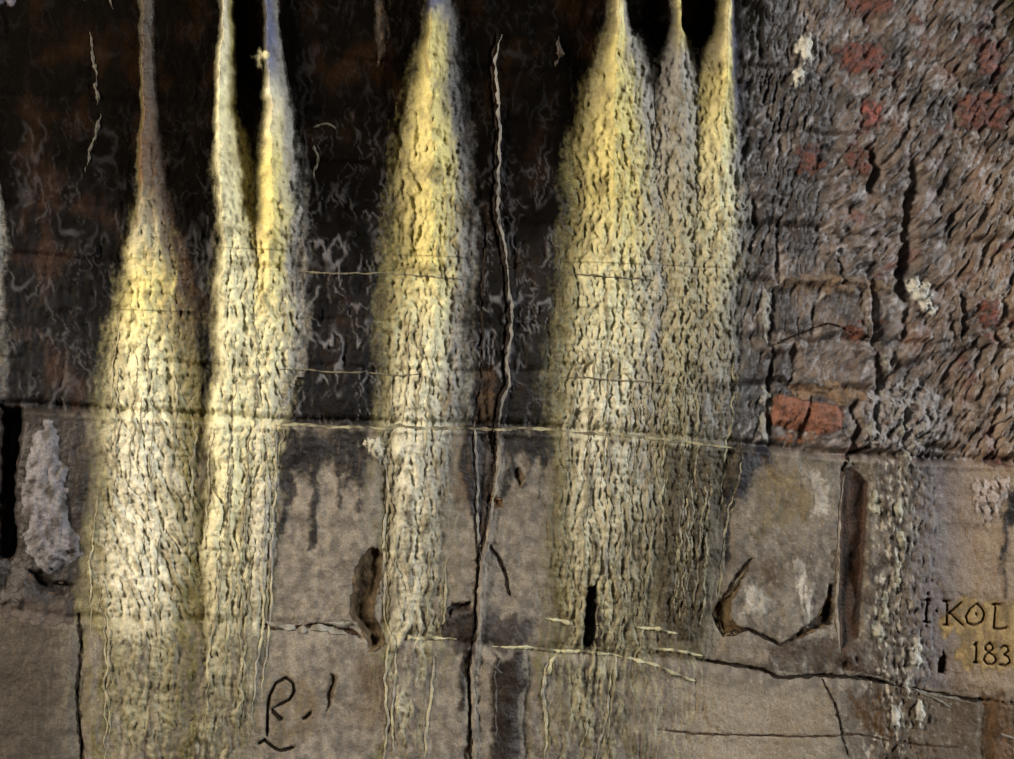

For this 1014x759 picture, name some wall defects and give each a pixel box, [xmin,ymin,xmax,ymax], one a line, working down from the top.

spalling [0,405,24,425]
damp [0,0,494,759]
crack [467,35,529,759]
damp [501,0,833,759]
spalling [349,547,386,651]
damp [481,612,532,654]
spalling [713,565,749,636]
crack [713,559,829,646]
spalling [795,584,834,638]
crack [665,660,1014,755]